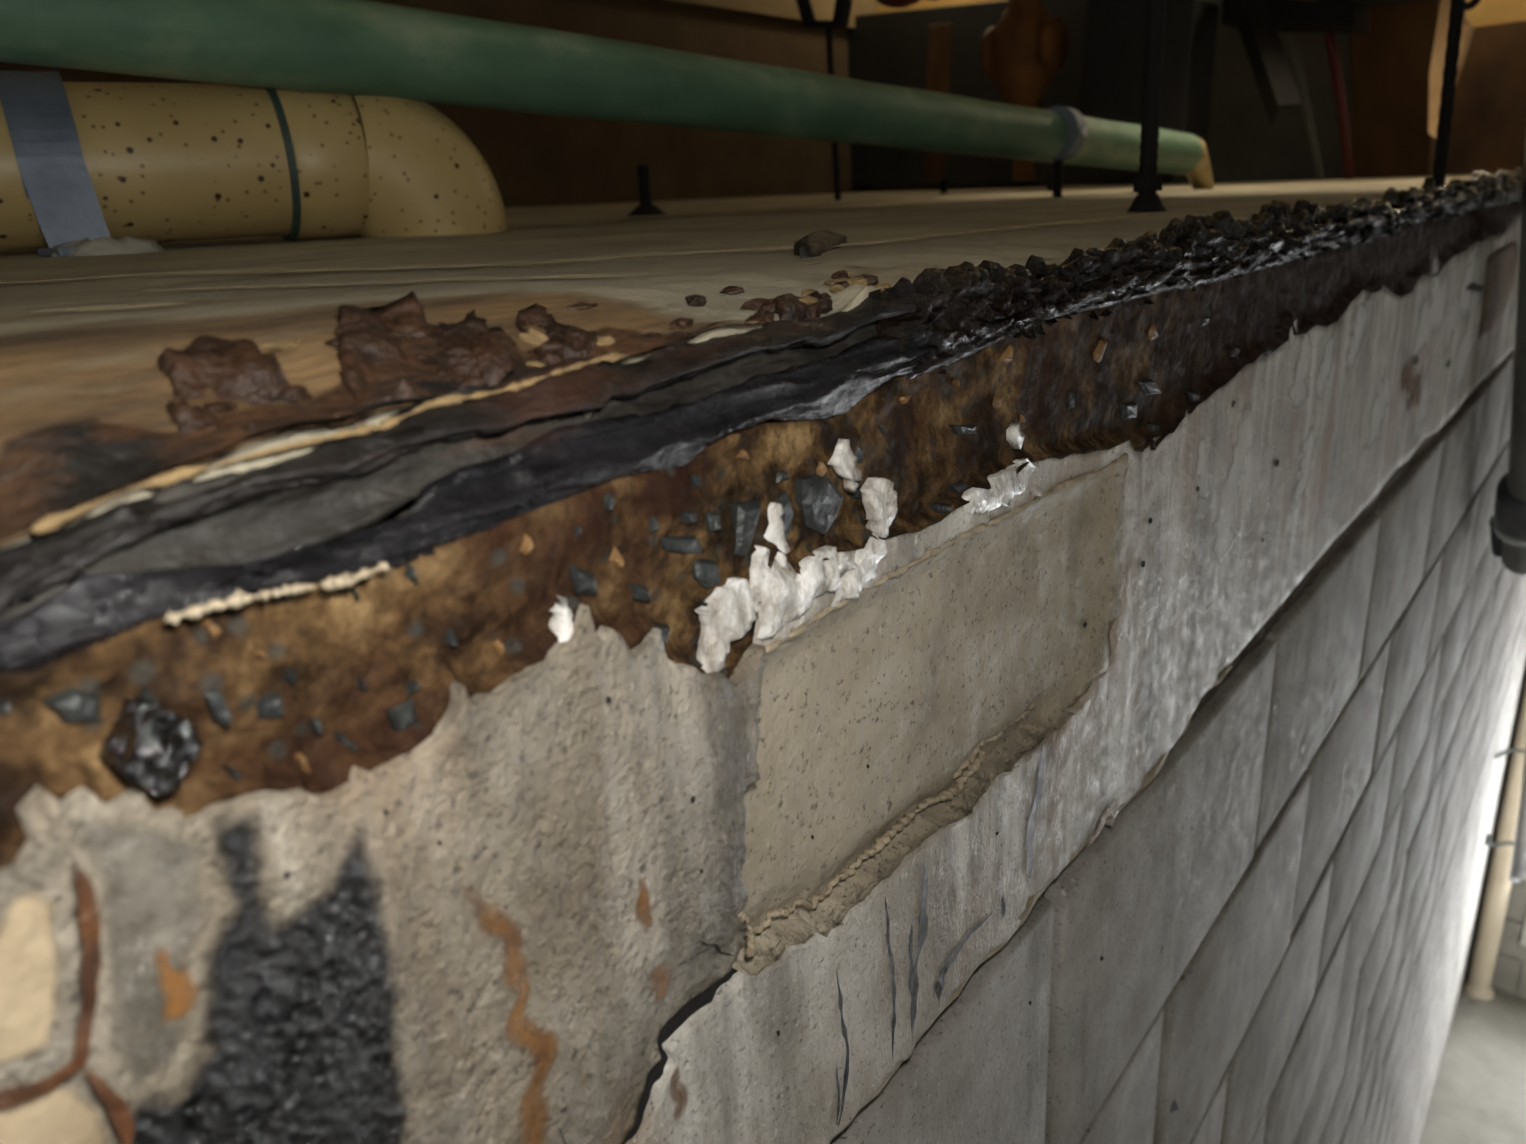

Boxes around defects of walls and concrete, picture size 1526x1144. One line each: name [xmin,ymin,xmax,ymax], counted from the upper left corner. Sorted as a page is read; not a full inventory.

spalling [0,198,1523,869]
crack [621,940,738,1144]
crack [836,969,849,1126]
crack [885,749,1045,1055]